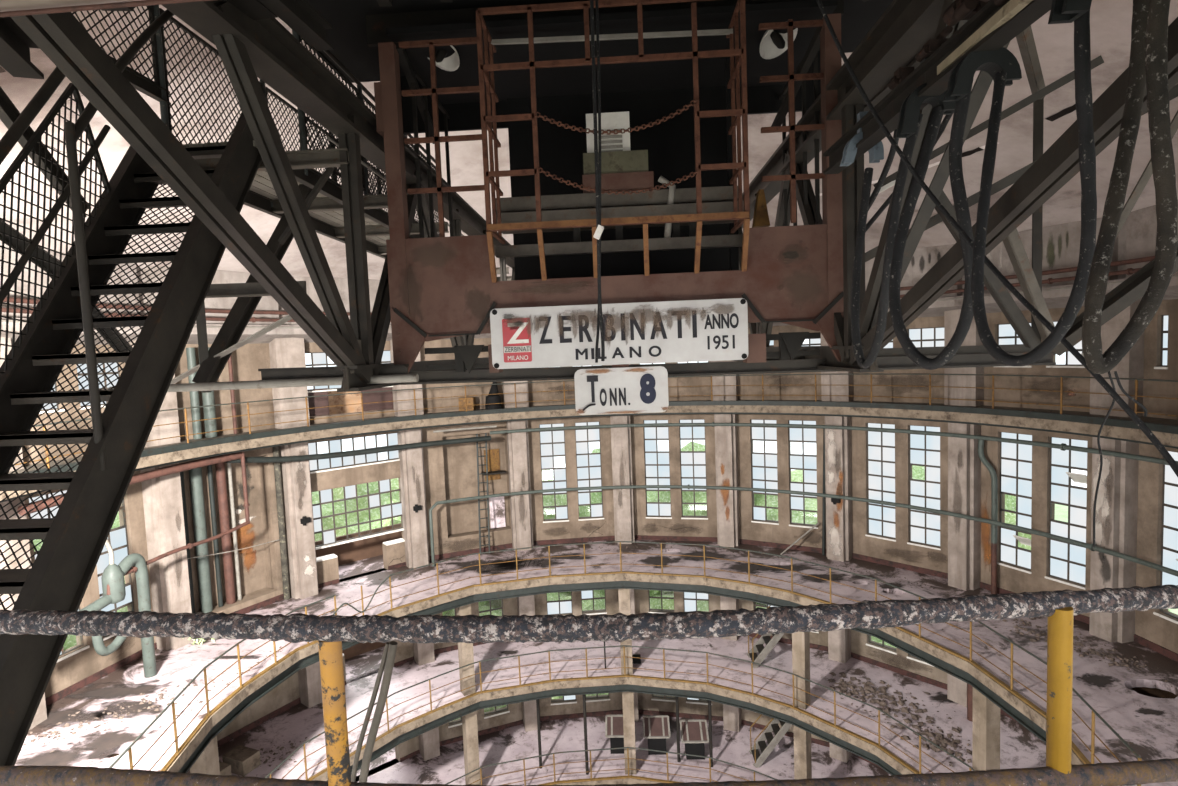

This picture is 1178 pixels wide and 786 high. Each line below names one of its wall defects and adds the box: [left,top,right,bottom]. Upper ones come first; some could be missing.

rust [721,464,730,520]
rust [231,524,256,569]